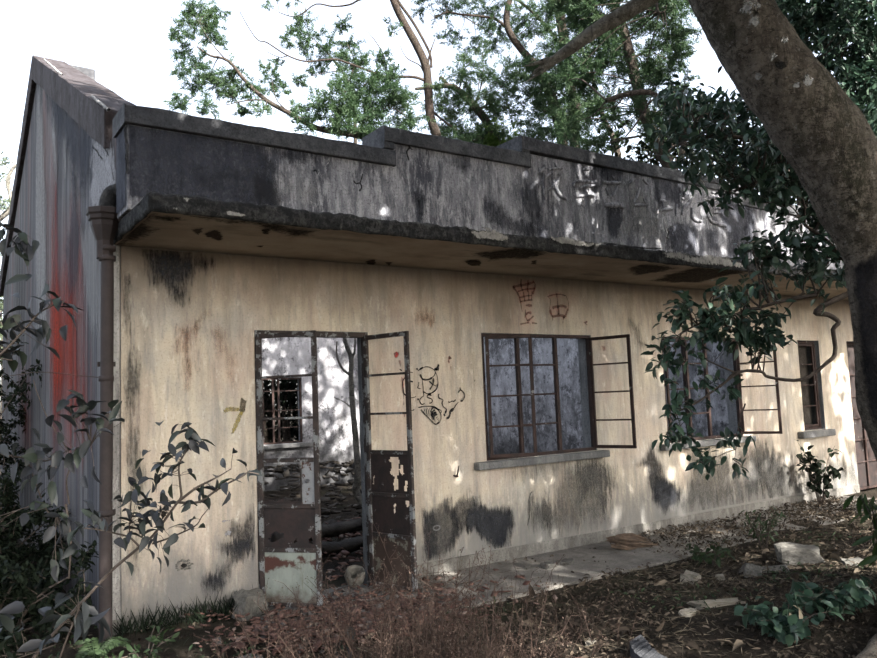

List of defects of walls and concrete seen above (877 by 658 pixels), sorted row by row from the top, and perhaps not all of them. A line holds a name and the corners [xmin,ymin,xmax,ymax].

water stain [413,189,425,223]
water stain [607,177,696,255]
water stain [706,194,755,258]
water stain [143,249,213,304]
water stain [631,264,745,283]
water stain [640,441,807,512]
water stain [206,514,255,590]
water stain [424,497,513,559]